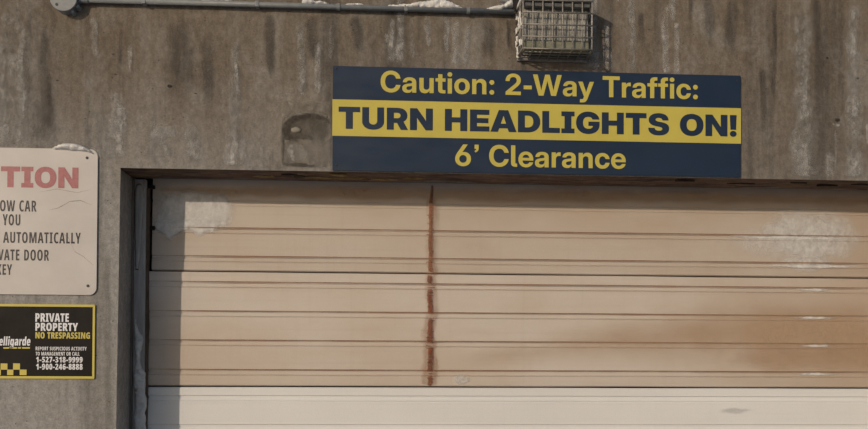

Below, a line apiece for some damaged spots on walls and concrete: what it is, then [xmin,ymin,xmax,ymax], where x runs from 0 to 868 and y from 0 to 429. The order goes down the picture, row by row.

leakage [791,23,810,169]
rust [189,186,854,386]